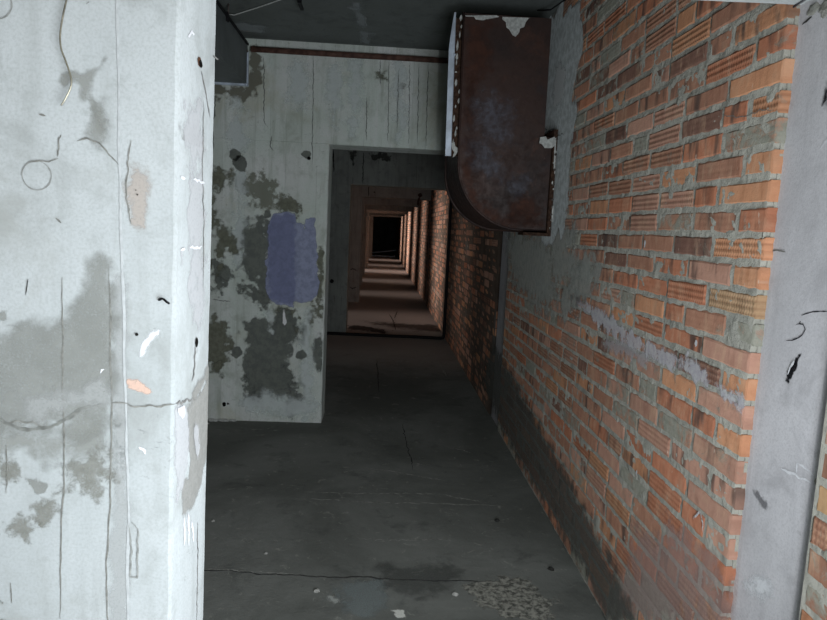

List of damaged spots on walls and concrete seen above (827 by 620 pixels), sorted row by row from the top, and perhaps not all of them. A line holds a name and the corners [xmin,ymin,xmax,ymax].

leakage [61,71,104,142]
leakage [210,166,325,421]
leakage [0,256,115,455]
crack [0,398,192,432]
crack [196,530,494,620]
spalling [462,575,559,620]